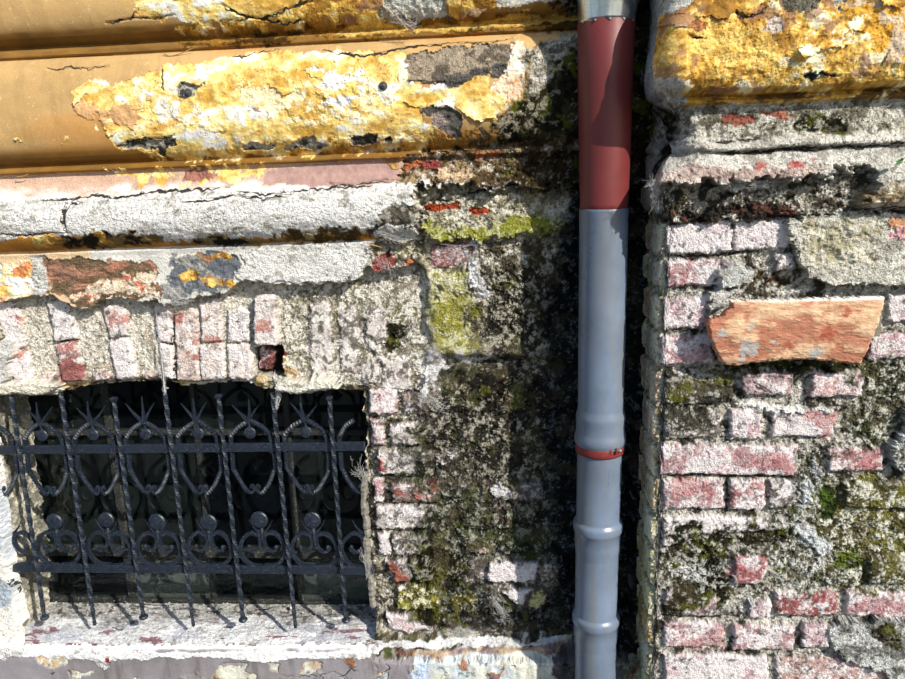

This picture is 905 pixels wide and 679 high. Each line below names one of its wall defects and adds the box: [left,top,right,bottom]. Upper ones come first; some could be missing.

crack [224,0,313,26]
peeling [134,0,553,37]
crack [324,39,507,58]
peeling [644,0,905,128]
spalling [630,128,650,183]
crack [0,179,387,237]
peeling [0,41,579,679]
water stain [417,346,493,409]
water stain [534,183,580,643]
water stain [616,105,690,664]
water stain [734,401,841,415]
water stain [793,459,833,556]